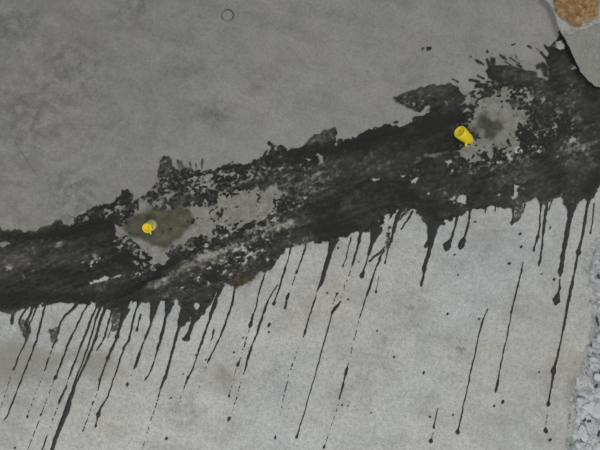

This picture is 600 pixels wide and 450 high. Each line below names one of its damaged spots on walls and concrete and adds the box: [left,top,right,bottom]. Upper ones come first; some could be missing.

flaking render [546,0,600,35]
damp [123,205,195,247]
damp [316,236,340,292]
damp [360,225,383,278]
damp [420,220,442,287]
damp [94,301,141,428]
damp [133,301,159,369]
damp [157,309,186,401]
damp [182,283,225,389]
damp [546,195,593,407]
spalling [567,238,600,450]
damp [50,392,74,450]